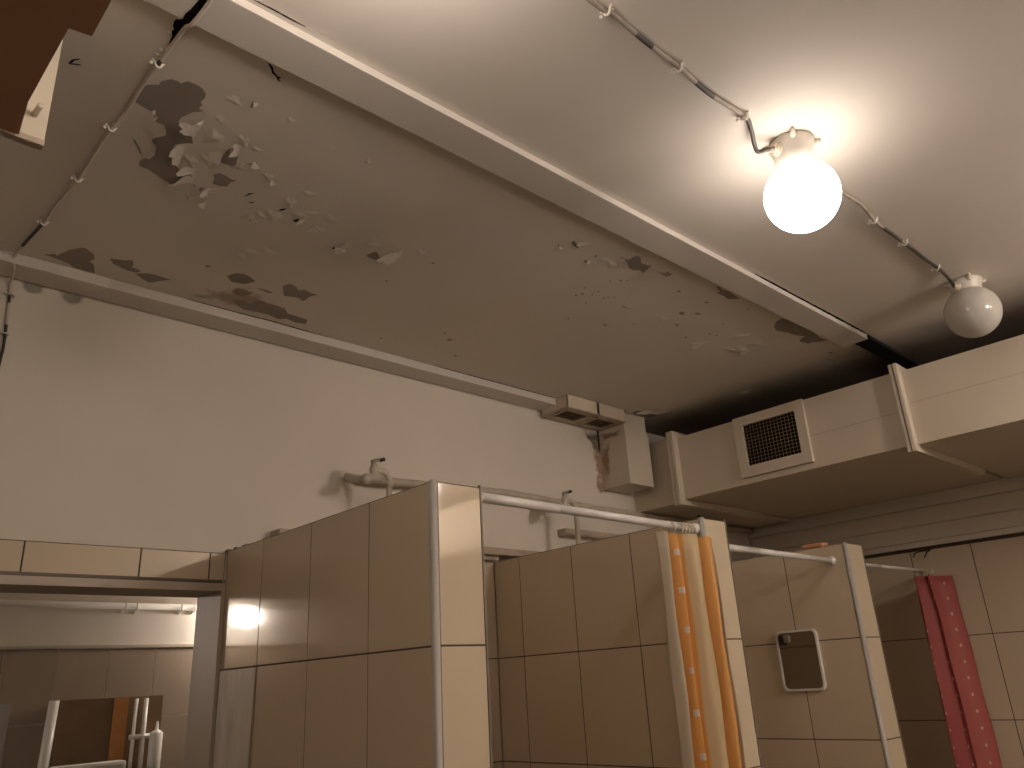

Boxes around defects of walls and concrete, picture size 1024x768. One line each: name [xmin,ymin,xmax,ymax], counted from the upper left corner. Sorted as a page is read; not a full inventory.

crack [156,0,207,56]
peeling [133,79,265,209]
peeling [11,244,110,292]
peeling [110,258,170,283]
peeling [227,273,316,324]
peeling [557,241,673,309]
peeling [774,318,833,353]
water stain [587,431,600,451]